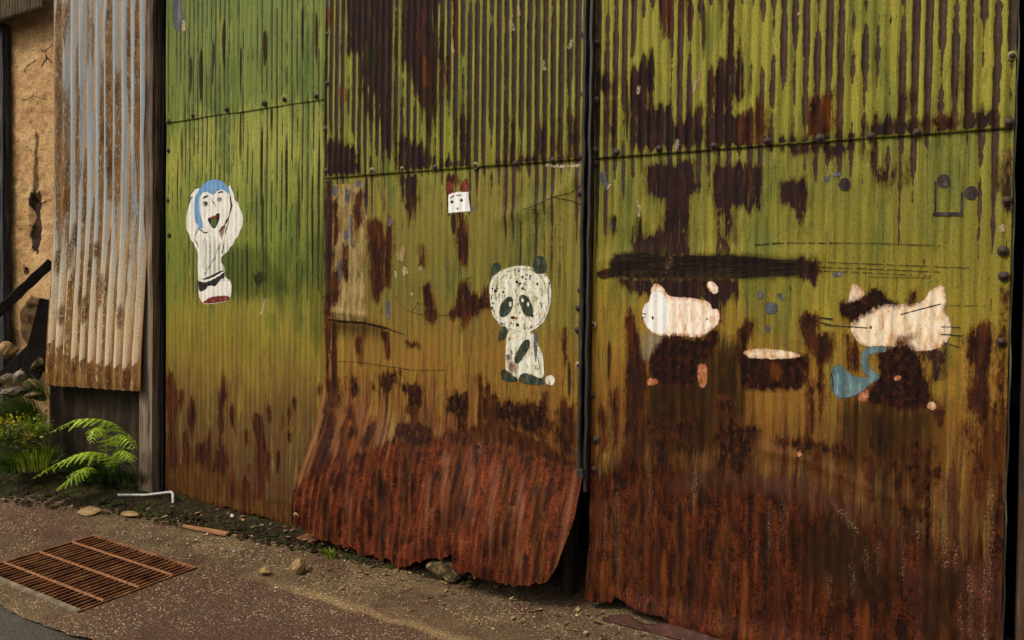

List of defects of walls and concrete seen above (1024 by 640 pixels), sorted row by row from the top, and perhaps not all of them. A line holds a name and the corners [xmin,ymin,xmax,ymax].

rust [45,0,141,391]
rust [166,0,583,587]
rust [595,0,997,256]
rust [585,287,1010,640]